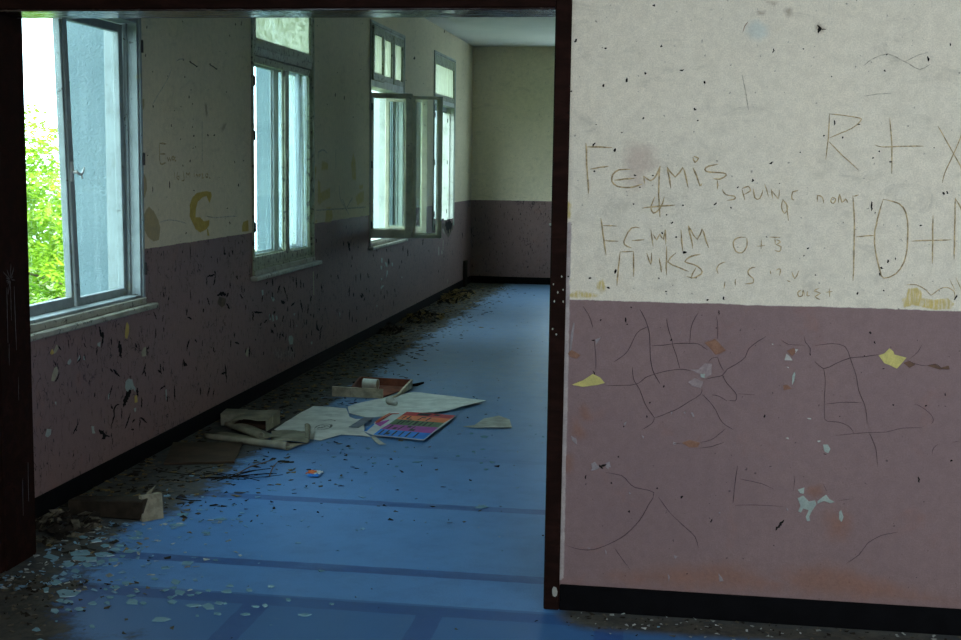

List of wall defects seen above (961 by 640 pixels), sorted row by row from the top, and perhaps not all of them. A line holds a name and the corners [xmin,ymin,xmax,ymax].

peeling [49,313,164,444]
peeling [190,217,323,373]
spalling [422,218,463,245]
spalling [552,219,606,597]
crack [584,308,902,465]
peeling [878,345,951,371]
crack [569,472,698,569]
peeling [775,479,844,531]